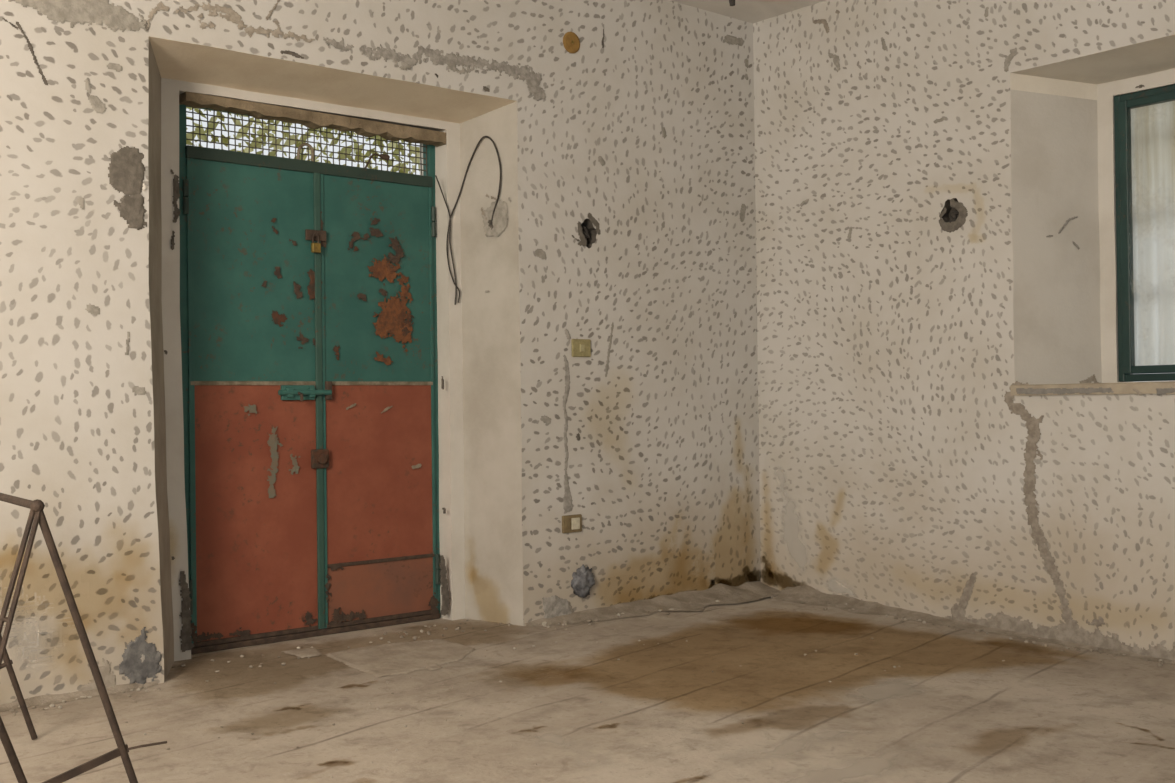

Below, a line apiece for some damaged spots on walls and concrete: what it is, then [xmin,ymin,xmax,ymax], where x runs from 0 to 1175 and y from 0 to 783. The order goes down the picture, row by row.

peeling [114,183,147,230]
corrosion [262,266,322,300]
corrosion [348,218,414,352]
corrosion [271,310,287,327]
crack [1004,381,1076,626]
leakage [710,567,801,588]